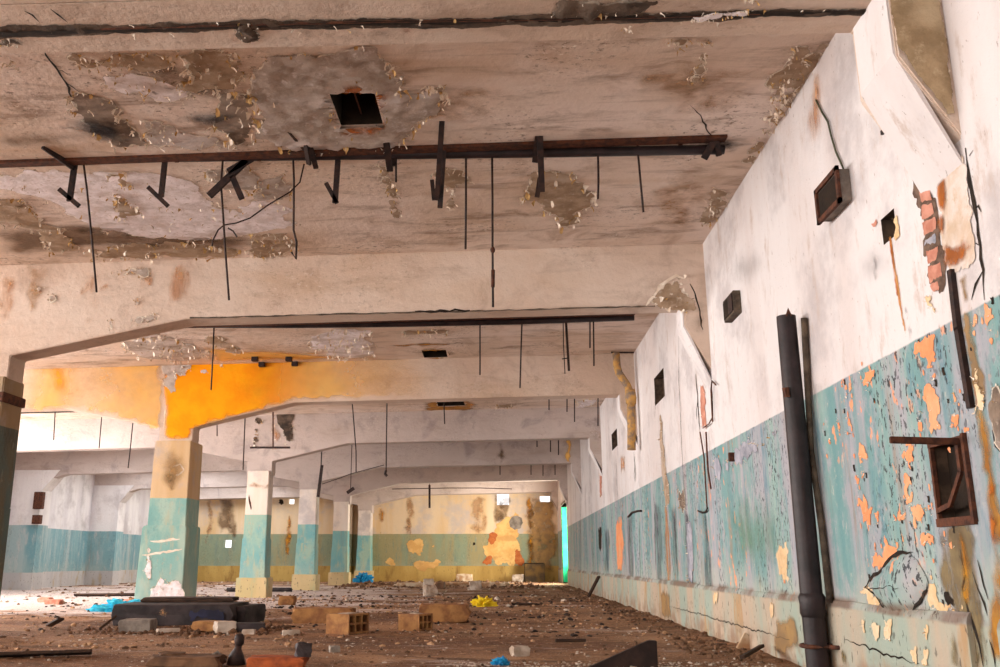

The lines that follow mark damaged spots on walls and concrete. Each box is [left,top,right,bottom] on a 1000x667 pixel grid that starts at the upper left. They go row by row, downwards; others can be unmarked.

peeling [64,46,451,156]
peeling [741,43,829,165]
peeling [0,165,299,279]
spalling [912,155,975,312]
corrosion [889,237,905,330]
peeling [306,329,377,362]
water stain [112,350,343,439]
water stain [167,460,179,489]
peeling [893,334,1000,549]
peeling [143,548,185,597]
flaking render [483,512,524,566]
water stain [526,498,557,569]